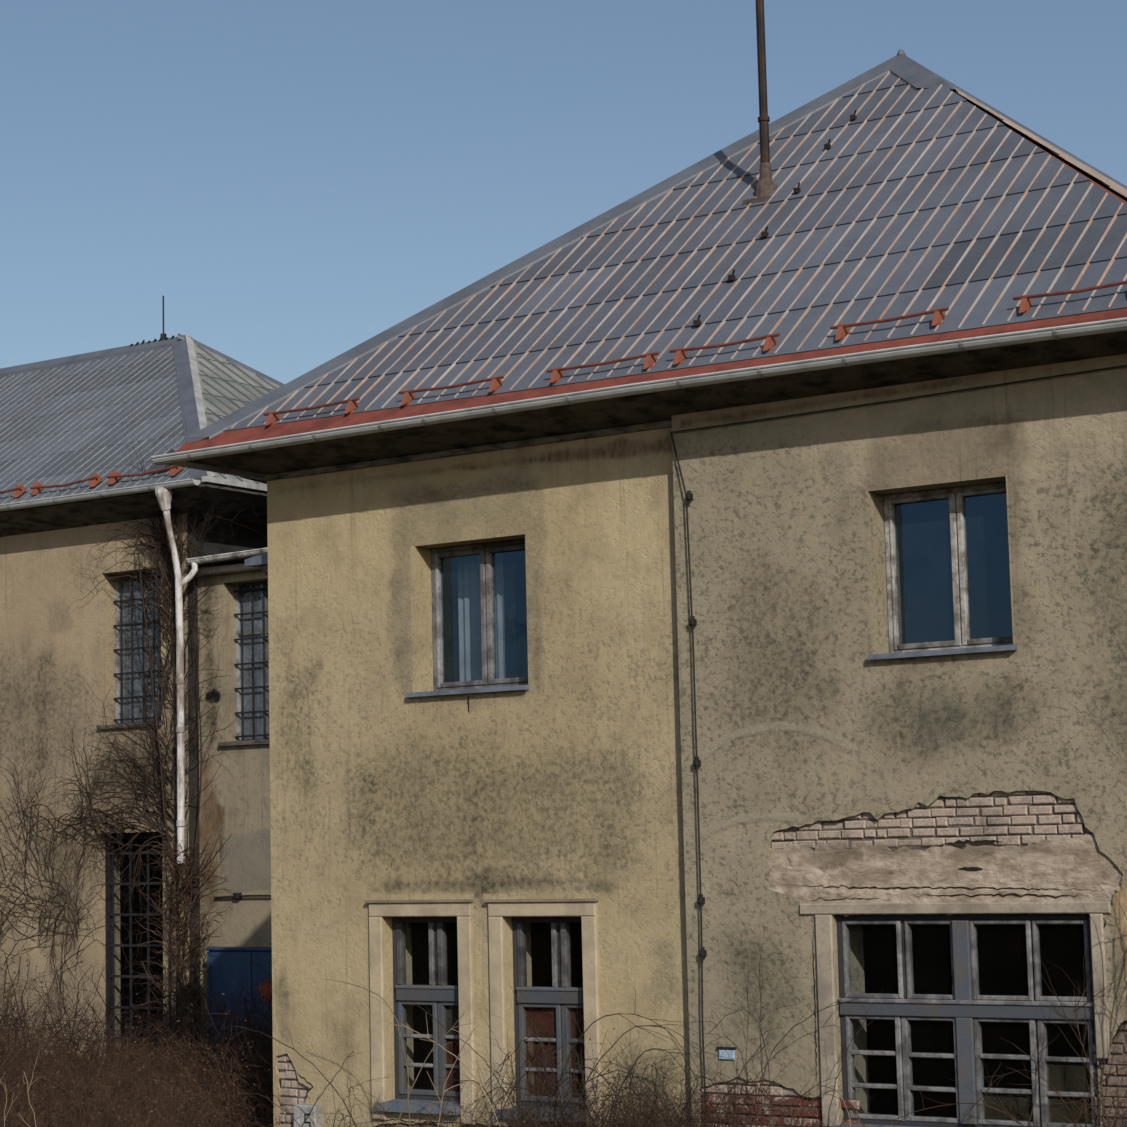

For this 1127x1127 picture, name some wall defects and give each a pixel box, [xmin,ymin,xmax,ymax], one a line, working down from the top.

flaking render [767,790,1127,1004]
flaking render [277,1053,309,1127]
flaking render [699,1077,822,1127]
flaking render [1092,1022,1127,1127]